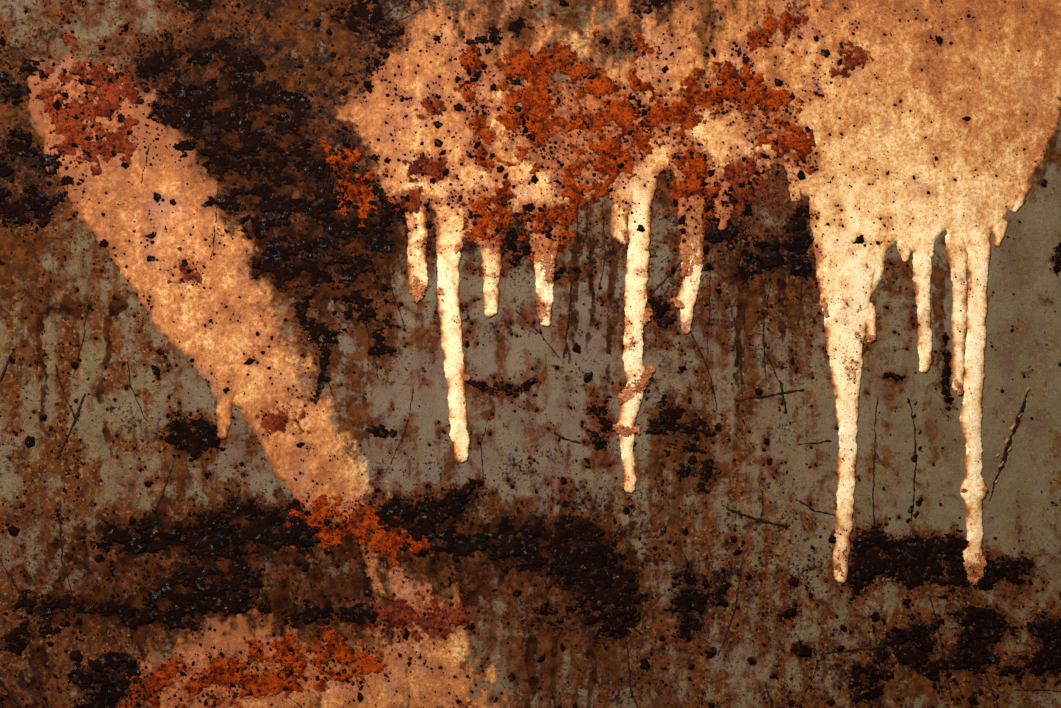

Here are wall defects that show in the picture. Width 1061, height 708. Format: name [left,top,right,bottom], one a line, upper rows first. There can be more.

rust [143,340,230,394]
rust [425,293,485,358]
rust [455,353,541,449]
rust [752,511,1061,708]